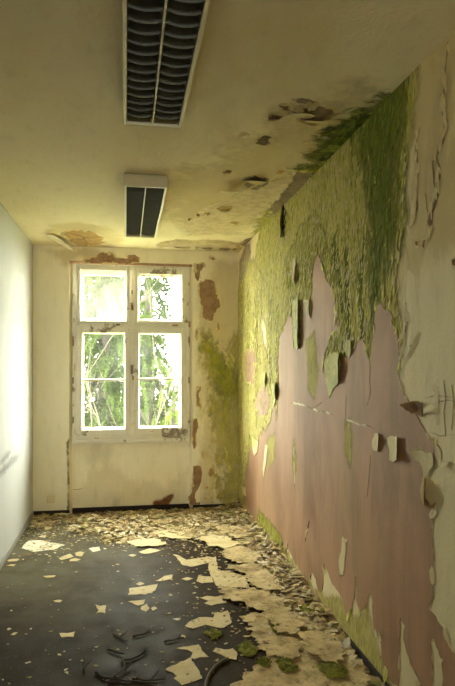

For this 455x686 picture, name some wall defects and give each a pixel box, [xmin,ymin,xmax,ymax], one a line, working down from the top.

flaking render [238,132,276,146]
flaking render [267,98,342,130]
flaking render [60,228,141,265]
peeling [156,170,313,334]
damp [332,235,364,341]
peeling [188,417,217,516]
peeling [227,254,455,686]